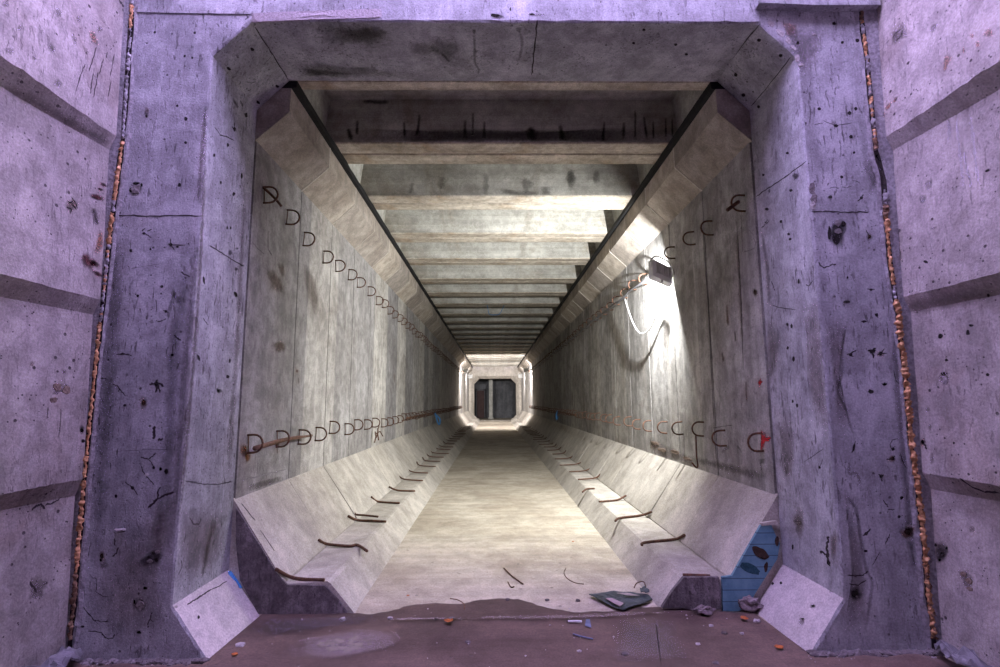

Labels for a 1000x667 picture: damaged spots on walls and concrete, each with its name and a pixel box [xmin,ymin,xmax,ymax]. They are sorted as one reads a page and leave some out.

crack [530,20,538,75]
spalling [828,220,846,245]